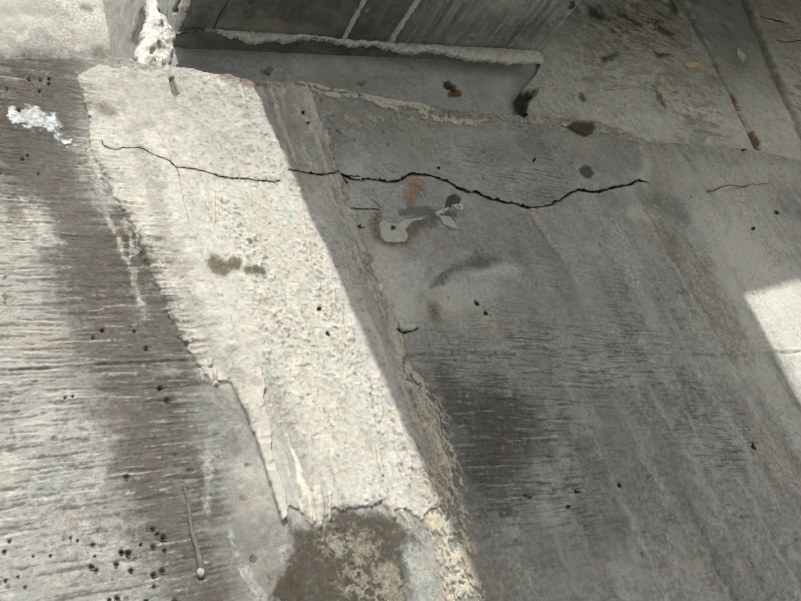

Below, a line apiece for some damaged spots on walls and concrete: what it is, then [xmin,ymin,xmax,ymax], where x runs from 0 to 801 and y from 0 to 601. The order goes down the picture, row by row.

crack [102,141,646,229]
peeling [371,195,464,245]
damp [0,47,533,601]